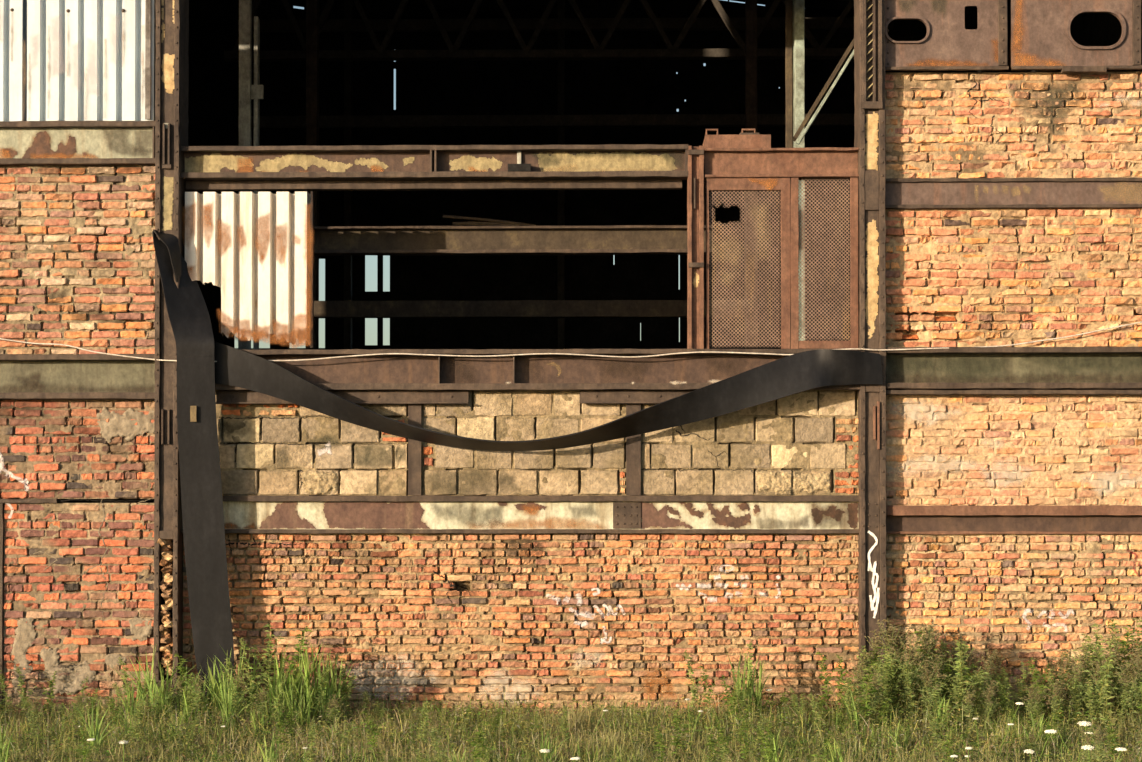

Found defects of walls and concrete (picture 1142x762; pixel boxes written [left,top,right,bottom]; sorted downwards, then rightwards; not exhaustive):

rust [1014,0,1058,66]
peeling [3,131,87,158]
peeling [449,155,503,172]
peeling [537,151,677,172]
peeling [865,112,879,171]
rust [184,205,286,261]
peeling [865,220,879,338]
rust [220,287,310,347]
peeling [498,502,547,512]